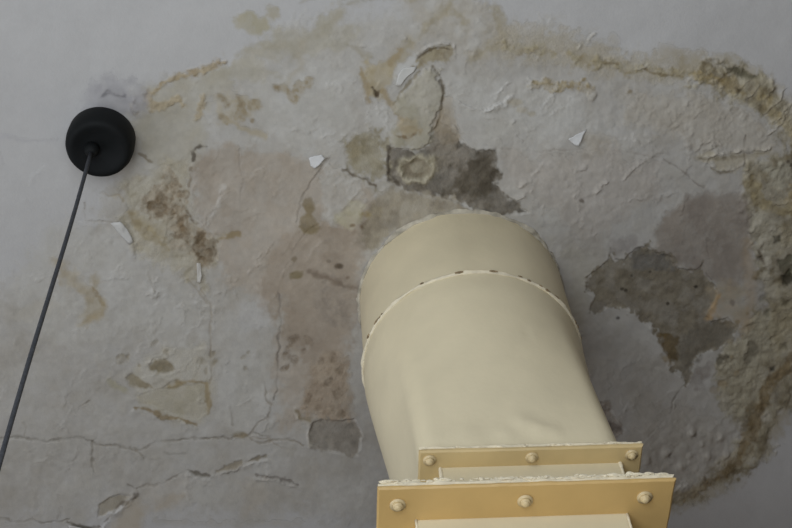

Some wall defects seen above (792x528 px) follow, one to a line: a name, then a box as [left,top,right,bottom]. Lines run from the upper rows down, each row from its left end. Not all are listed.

crack [0,234,306,474]
damp [0,0,413,528]
peeling [280,334,362,458]
flaking render [341,127,526,252]
damp [386,0,792,516]
flaking render [584,240,739,392]
peeling [693,135,773,176]
peeling [67,471,193,528]